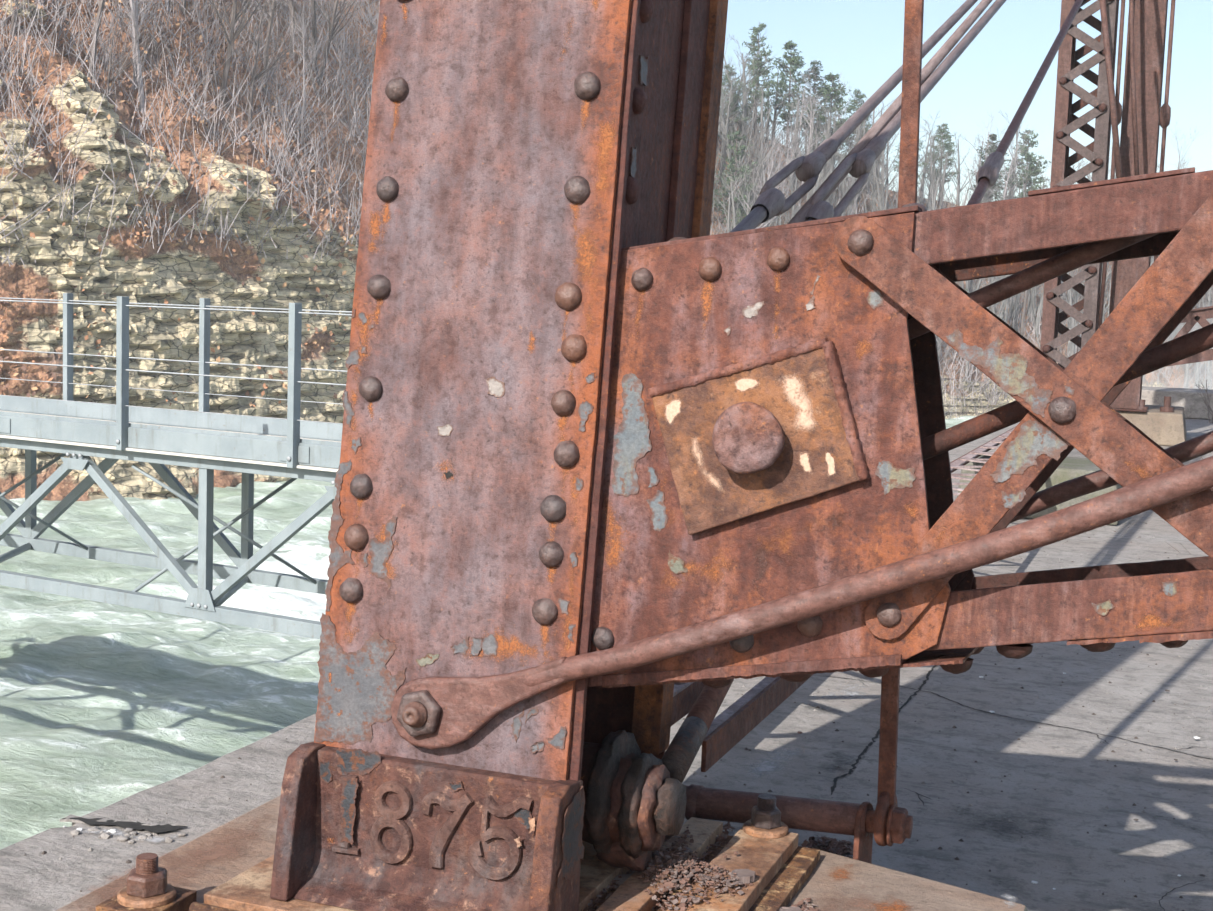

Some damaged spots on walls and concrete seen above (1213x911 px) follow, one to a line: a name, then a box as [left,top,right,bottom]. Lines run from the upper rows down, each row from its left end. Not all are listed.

corrosion [368,202,390,251]
corrosion [570,204,595,277]
corrosion [701,281,713,326]
peeling [666,400,681,423]
peeling [783,377,814,428]
peeling [946,329,1074,508]
peeling [612,373,668,532]
peeling [875,461,916,495]
corrosion [606,506,624,565]
peeling [315,389,498,845]
corrosion [469,625,548,664]
crack [813,665,1212,795]